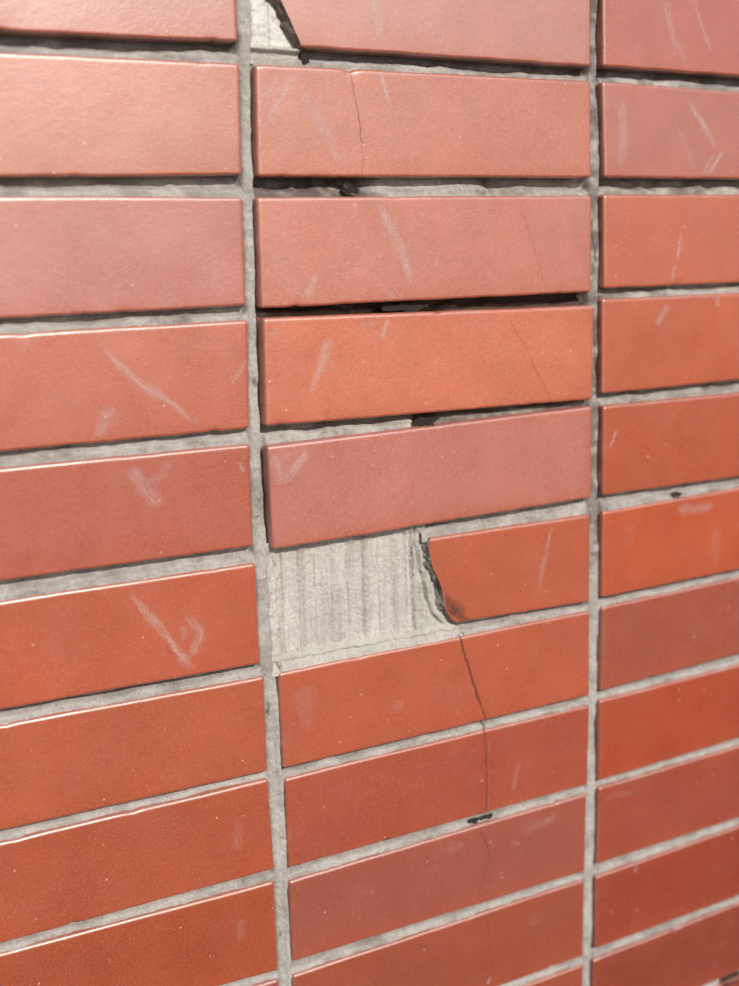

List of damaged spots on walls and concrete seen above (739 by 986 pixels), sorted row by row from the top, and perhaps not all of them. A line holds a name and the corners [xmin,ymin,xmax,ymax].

spalling [250,0,302,64]
spalling [266,524,463,677]